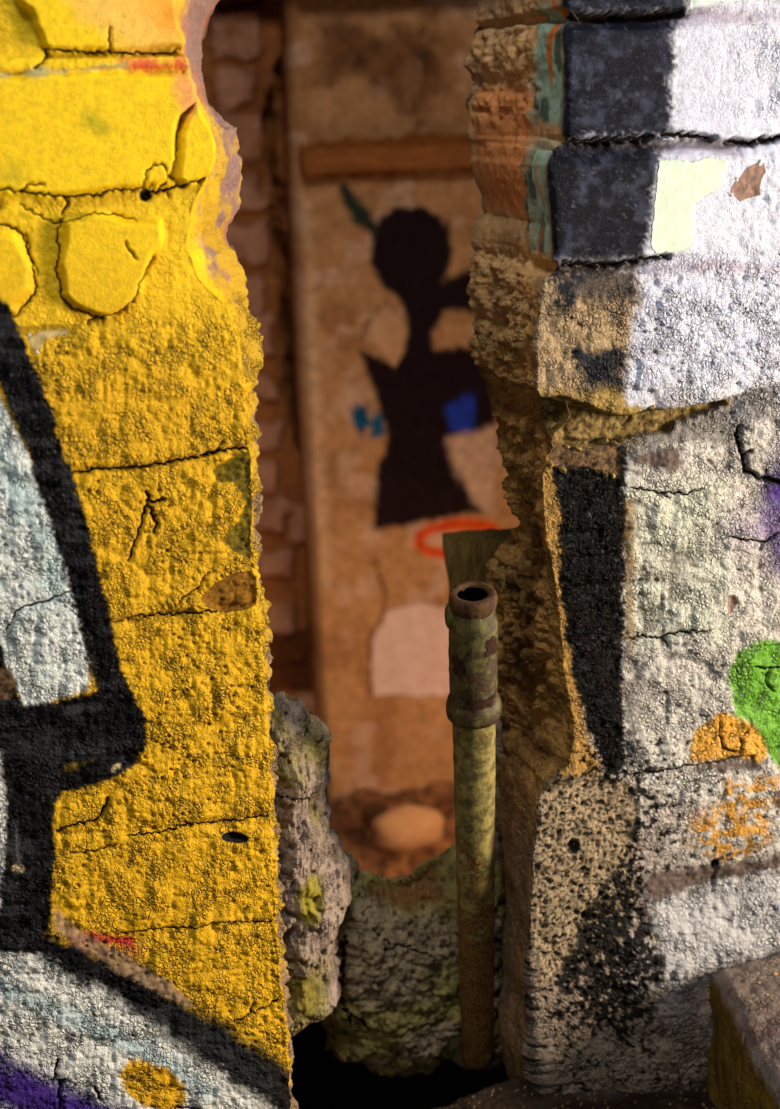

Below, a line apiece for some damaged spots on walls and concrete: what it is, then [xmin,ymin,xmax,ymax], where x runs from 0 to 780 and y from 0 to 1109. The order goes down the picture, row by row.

peeling [689,0,738,9]
peeling [651,157,766,254]
crack [733,426,780,485]
crack [631,487,700,498]
crack [623,629,708,645]